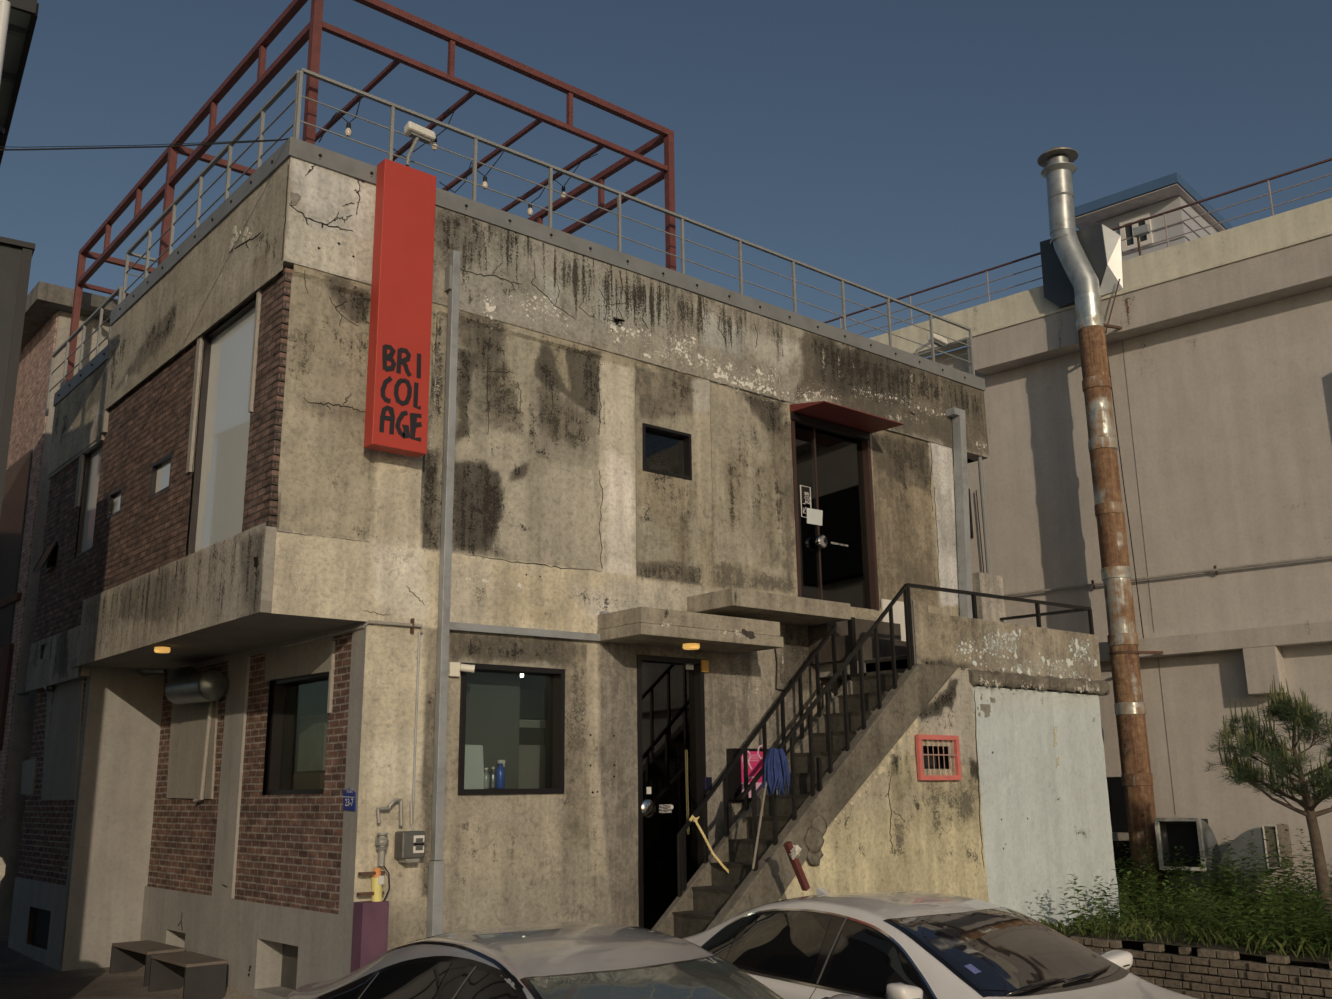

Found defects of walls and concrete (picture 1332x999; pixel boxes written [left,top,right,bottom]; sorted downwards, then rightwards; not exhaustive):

crack [230,165,364,326]
crack [303,395,364,412]
damp [420,209,748,555]
damp [811,337,989,508]